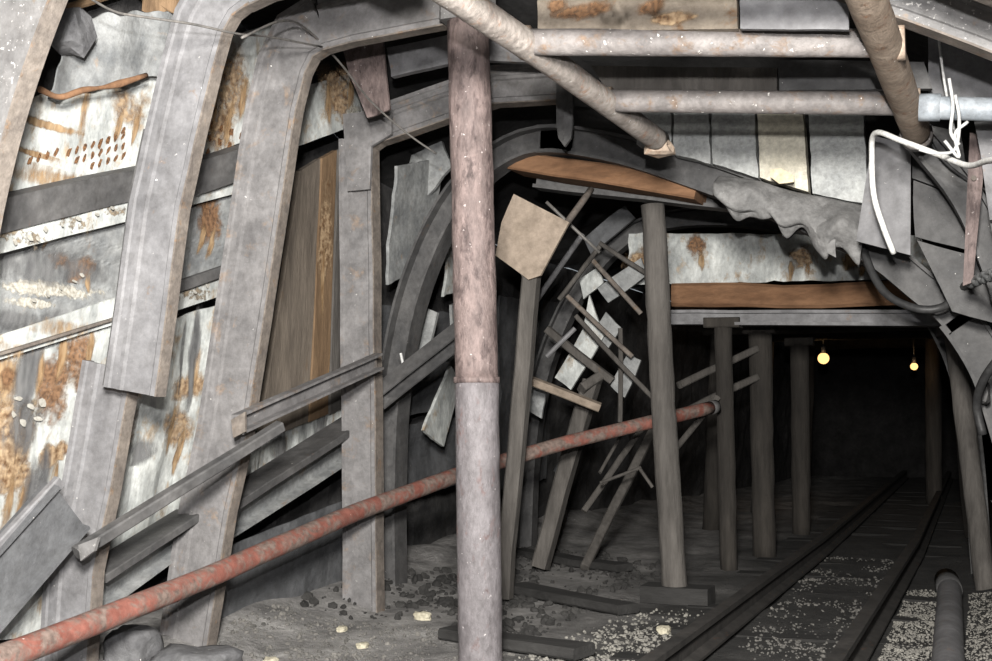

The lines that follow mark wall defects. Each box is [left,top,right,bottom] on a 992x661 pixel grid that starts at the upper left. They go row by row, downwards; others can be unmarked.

corrosion [639,0,697,25]
corrosion [26,93,89,135]
corrosion [207,53,248,151]
corrosion [13,146,74,184]
corrosion [197,199,221,255]
corrosion [0,322,94,525]
corrosion [164,352,204,473]